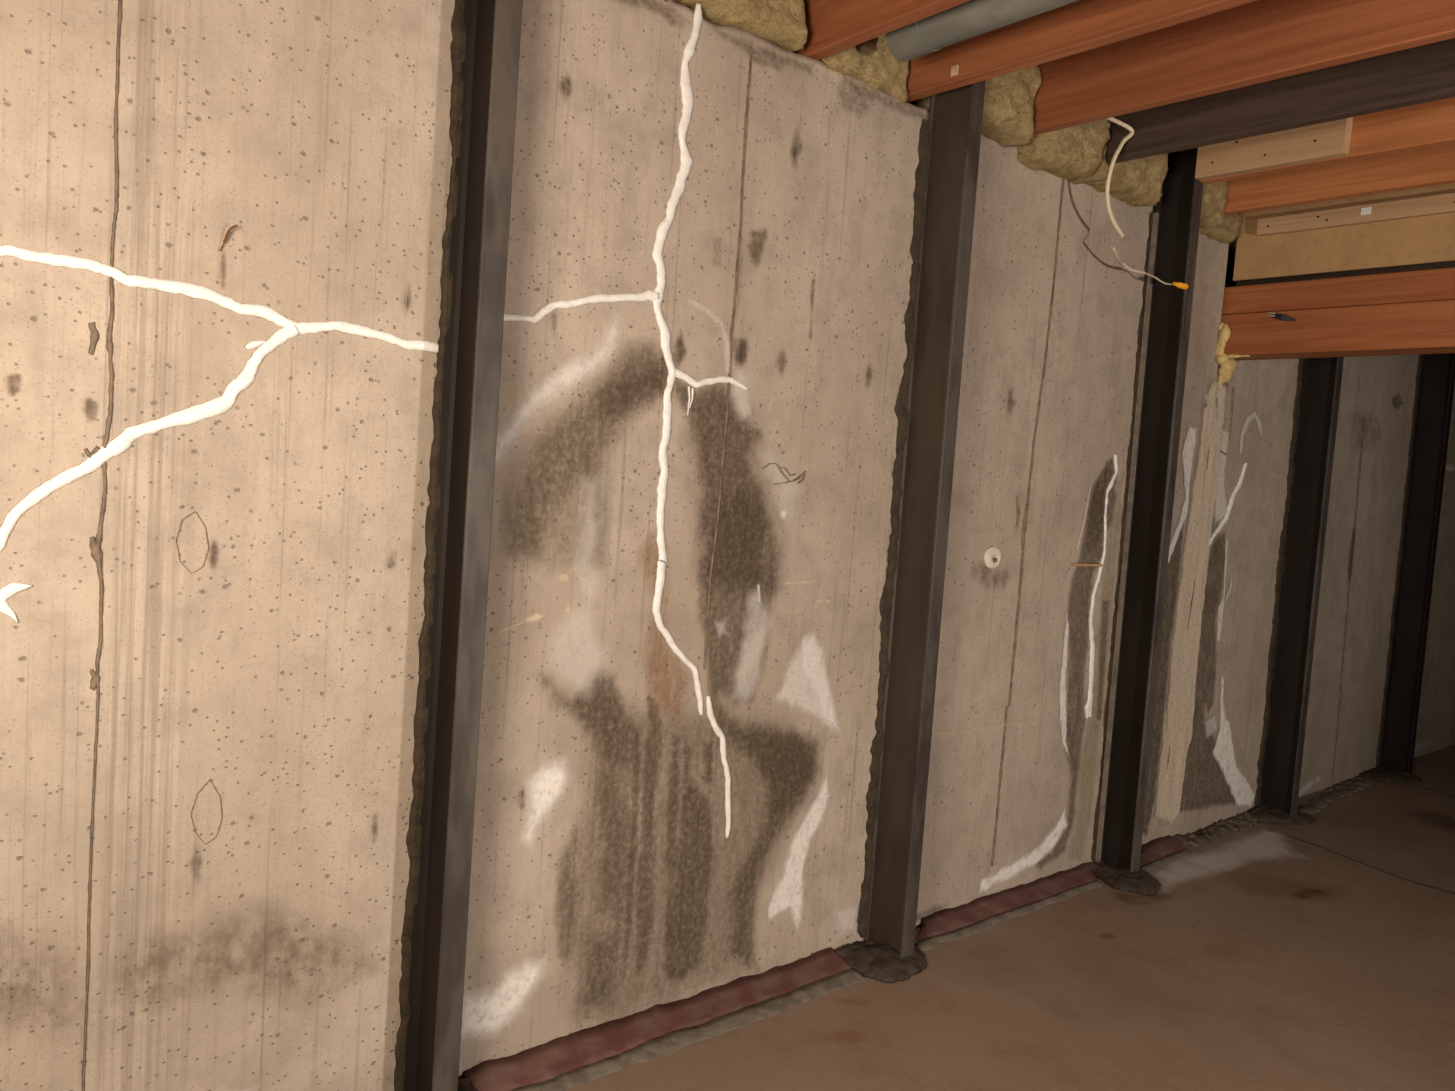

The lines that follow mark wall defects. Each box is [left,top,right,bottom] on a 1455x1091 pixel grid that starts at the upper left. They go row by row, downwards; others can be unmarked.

water stain [750,232,766,261]
crack [0,244,438,552]
efflorescence [525,764,566,841]
water stain [496,329,616,457]
crack [504,3,749,838]
water stain [574,679,827,1003]
water stain [683,391,786,698]
efflorescence [779,637,835,726]
water stain [980,461,1115,892]
crack [1085,455,1118,718]
crack [1271,830,1455,896]
efflorescence [461,963,540,1035]